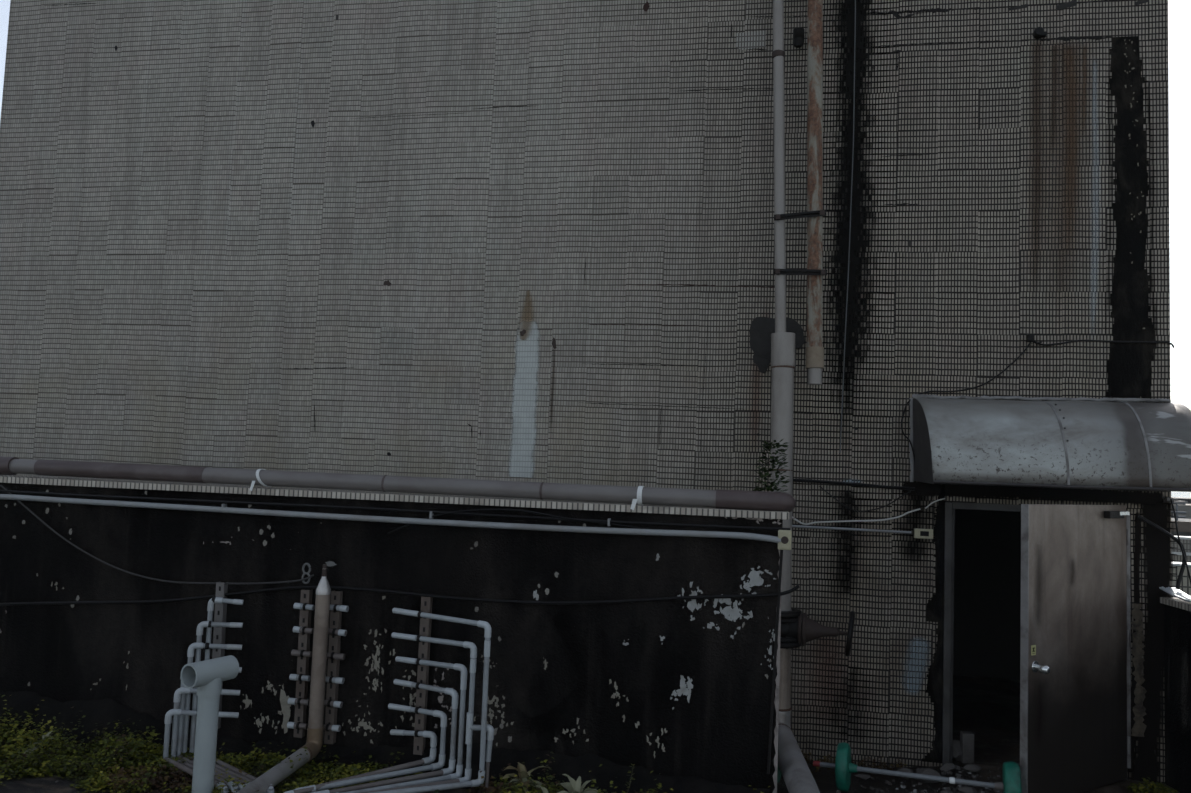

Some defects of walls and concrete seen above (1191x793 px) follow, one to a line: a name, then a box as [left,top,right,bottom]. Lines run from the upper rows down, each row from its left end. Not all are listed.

water stain [810,0,908,434]
water stain [1103,70,1114,310]
water stain [1143,75,1160,354]
peeling [609,679,667,759]
peeling [670,675,693,710]
peeling [677,566,776,639]
spalling [922,485,945,763]